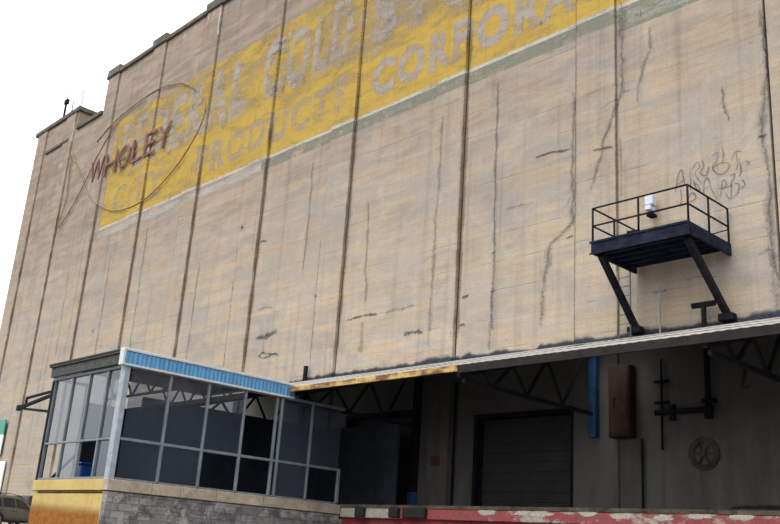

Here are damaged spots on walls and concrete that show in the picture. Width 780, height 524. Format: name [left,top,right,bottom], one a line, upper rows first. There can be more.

crack [594,37,629,171]